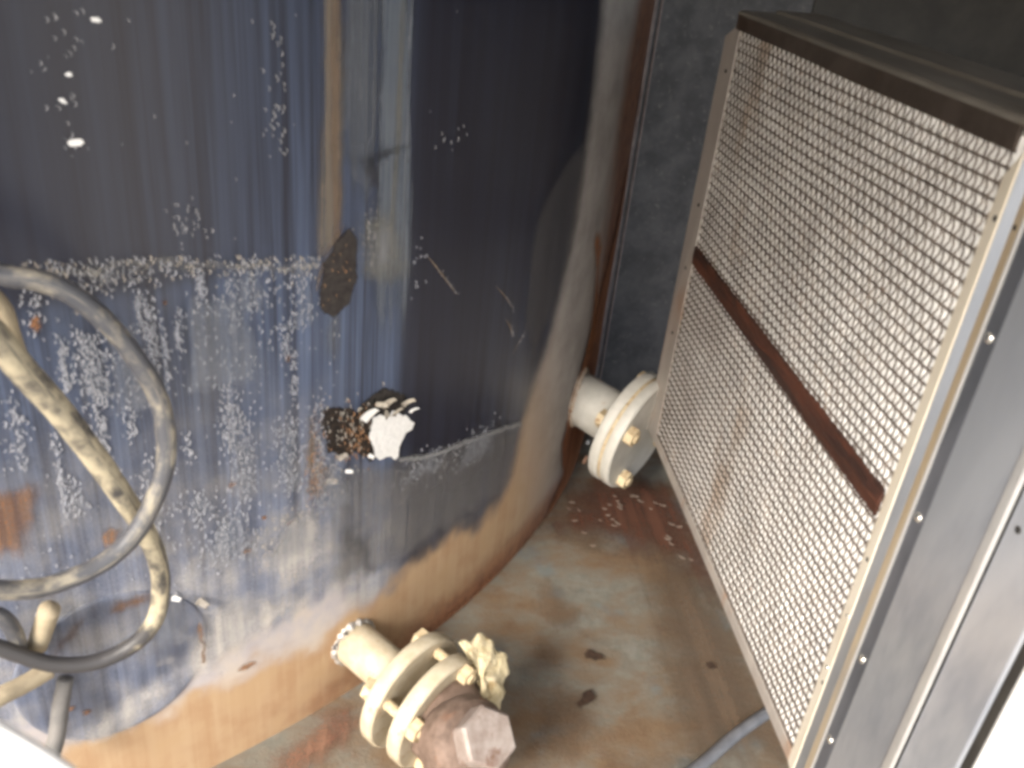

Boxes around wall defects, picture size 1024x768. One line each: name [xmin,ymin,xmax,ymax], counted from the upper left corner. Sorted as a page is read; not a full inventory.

damp [18,0,521,597]
rust [301,392,376,512]
peeling [358,388,420,460]
rust [543,153,765,746]
rust [735,722,781,756]